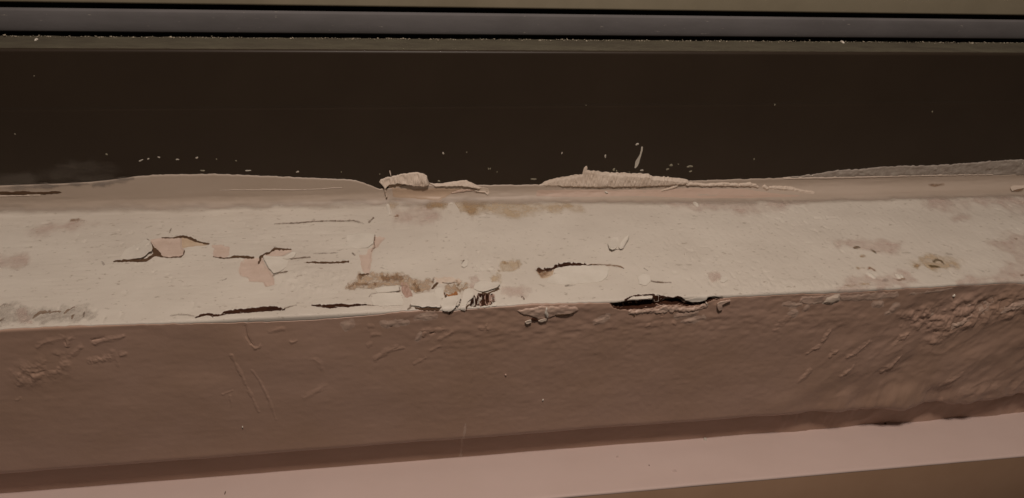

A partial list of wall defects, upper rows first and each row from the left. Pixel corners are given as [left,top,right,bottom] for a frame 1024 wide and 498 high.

peeling [379,172,481,198]
peeling [540,166,689,188]
spalling [113,229,385,301]
crack [195,303,374,318]
spalling [371,276,500,312]
peeling [517,305,578,324]
spalling [592,273,953,333]